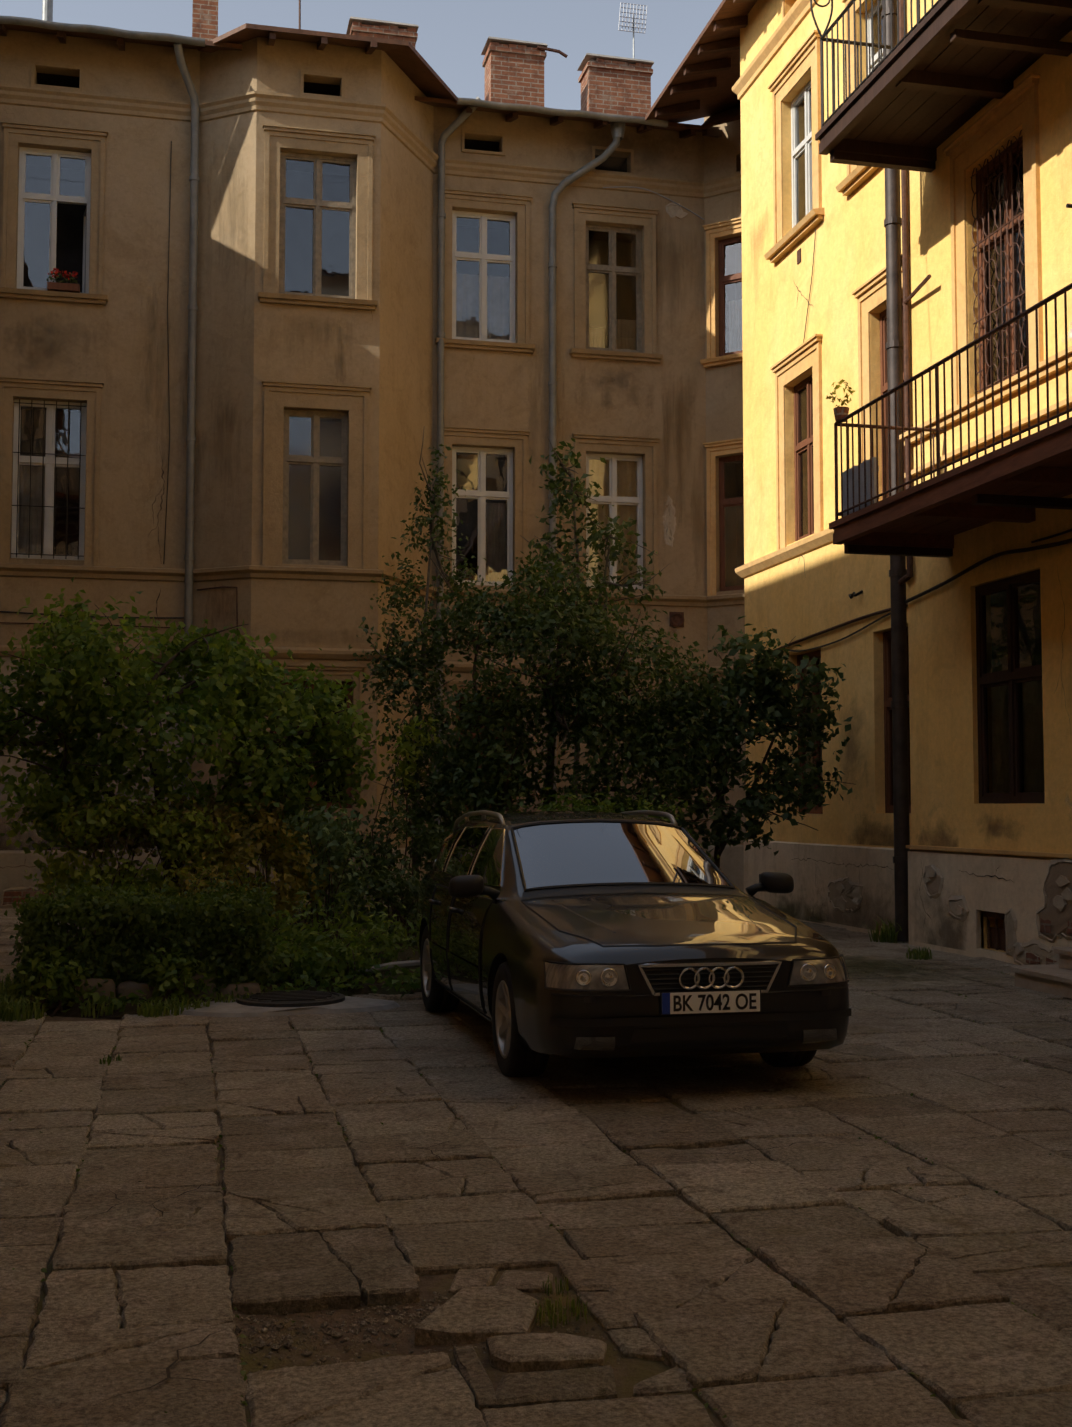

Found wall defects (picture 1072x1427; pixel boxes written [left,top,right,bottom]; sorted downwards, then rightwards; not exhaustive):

flaking render [1004,858,1072,965]